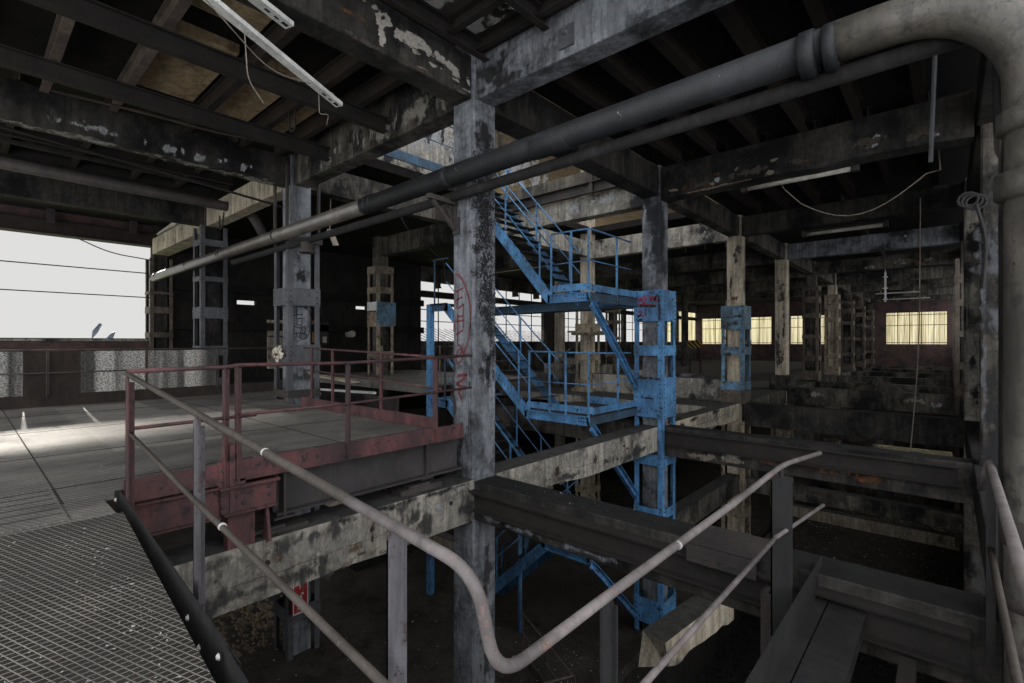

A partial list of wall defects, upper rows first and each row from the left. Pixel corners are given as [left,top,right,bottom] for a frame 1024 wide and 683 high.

peeling [341,0,470,95]
spalling [668,157,809,193]
water stain [205,484,474,621]